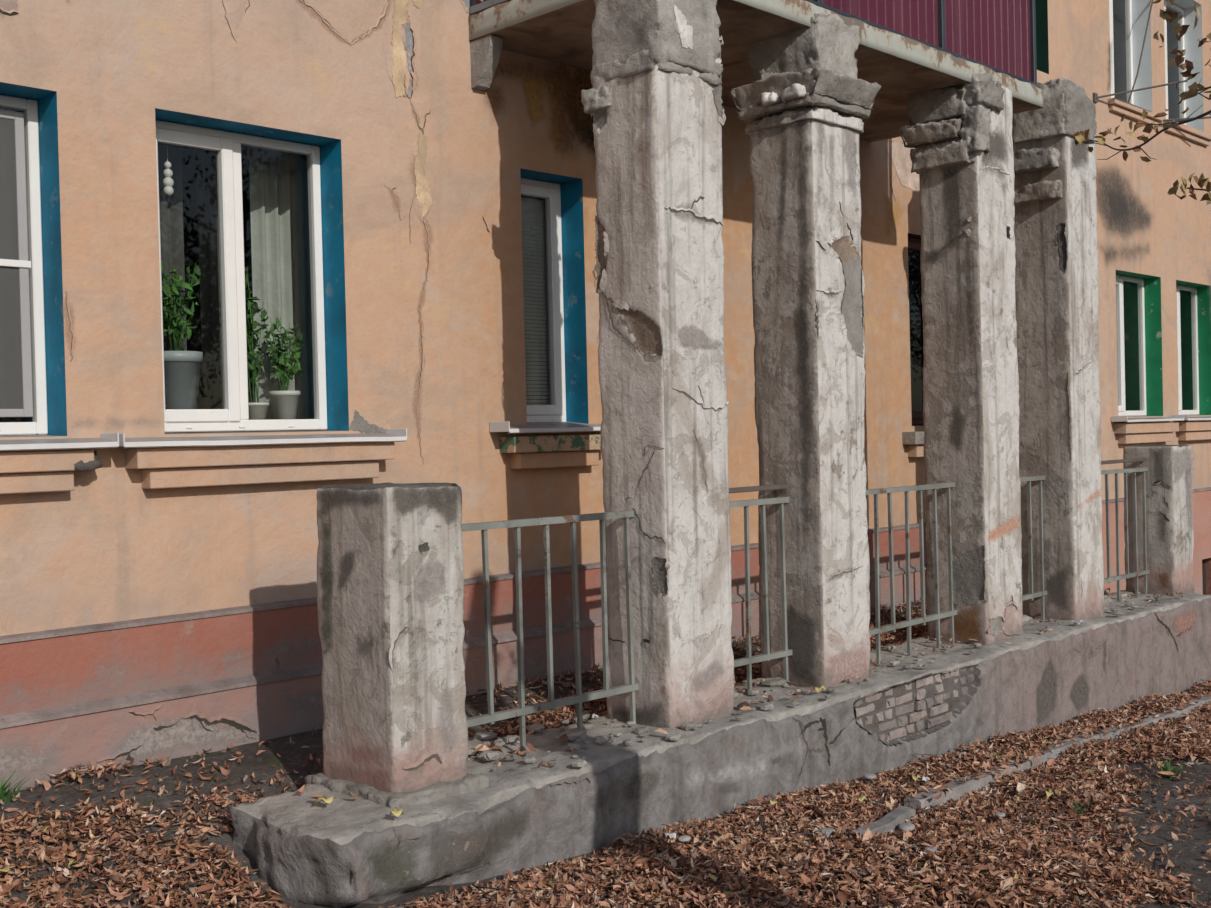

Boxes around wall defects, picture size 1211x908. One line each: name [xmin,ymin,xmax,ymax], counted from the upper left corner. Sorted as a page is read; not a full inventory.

spalling [674,5,694,49]
water stain [499,66,595,151]
crack [299,0,431,464]
crack [665,196,724,225]
water stain [1098,174,1150,232]
spalling [592,216,662,362]
spalling [822,235,865,358]
crack [673,386,729,493]
water stain [395,485,456,522]
water stain [321,487,378,647]
crack [793,717,855,775]
flaking render [853,664,981,747]